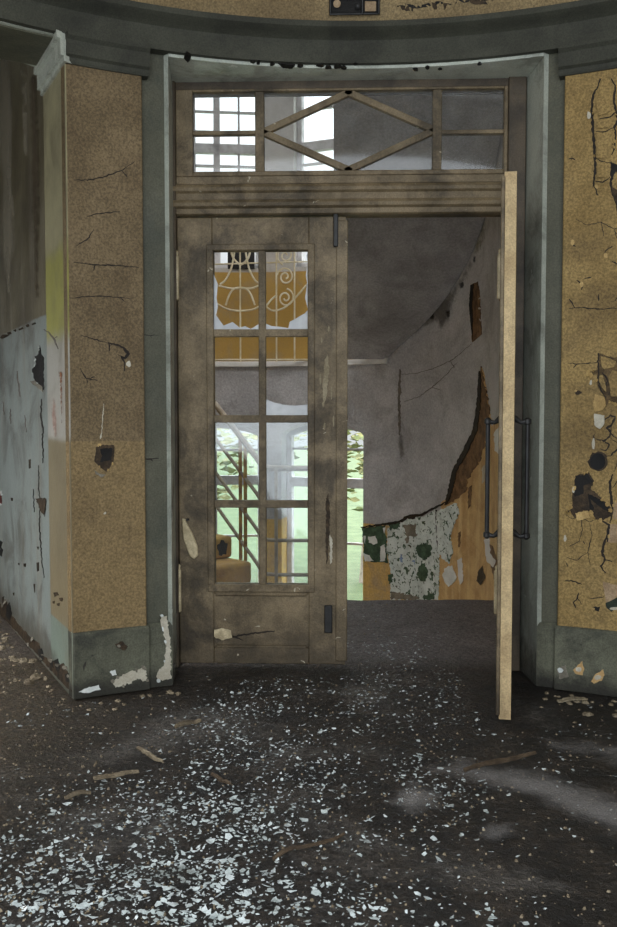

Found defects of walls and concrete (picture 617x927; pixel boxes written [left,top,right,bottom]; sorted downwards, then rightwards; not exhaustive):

crack [569,78,617,264]
spalling [469,281,482,342]
crack [569,277,617,310]
peeling [30,346,44,392]
crack [82,335,131,371]
peeling [586,353,617,429]
spalling [94,444,115,477]
peeling [360,366,499,618]
peeling [565,471,617,543]
peeling [0,593,101,715]
peeling [110,614,172,688]
peeling [0,629,506,927]